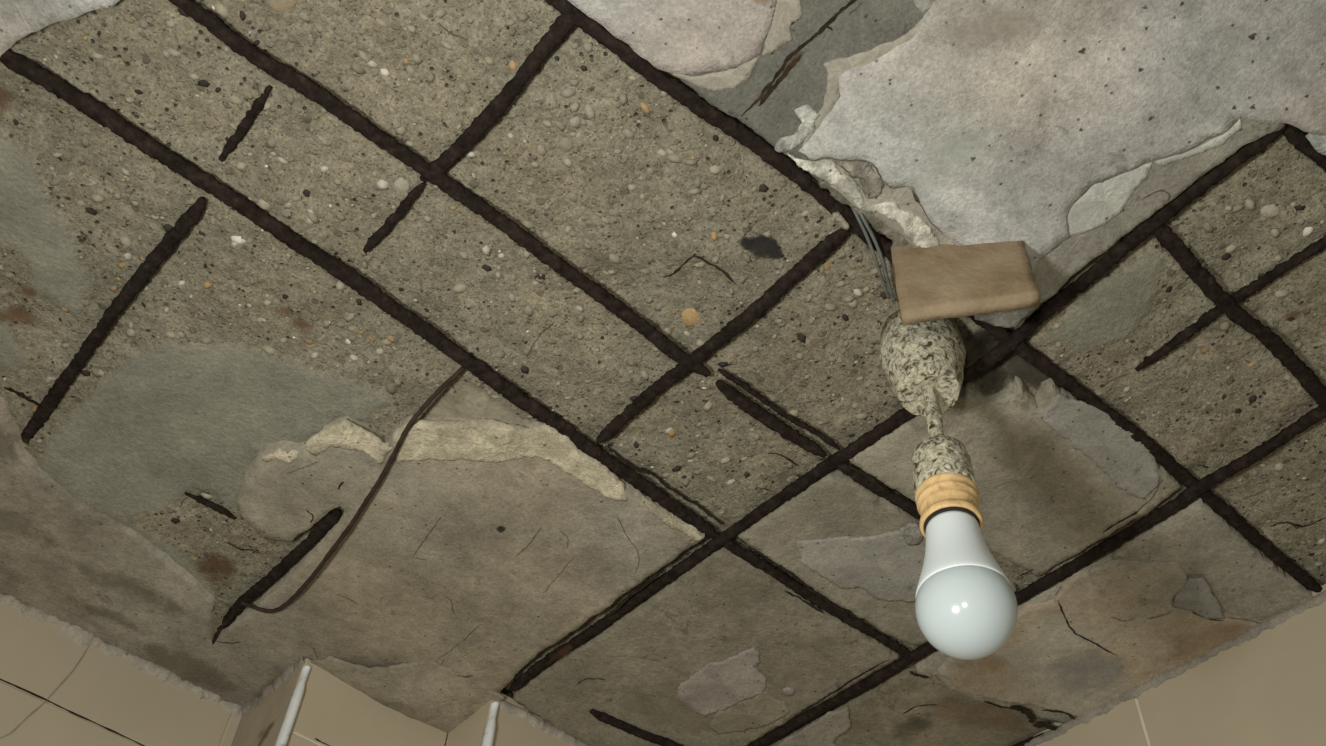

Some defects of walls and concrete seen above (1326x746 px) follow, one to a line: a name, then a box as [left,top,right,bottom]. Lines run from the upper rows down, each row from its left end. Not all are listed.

crack [741,0,862,117]
spalling [0,0,955,746]
spalling [941,234,1326,594]
spalling [1013,117,1326,388]
crack [0,645,144,746]
crack [212,606,239,645]
peeling [766,497,1313,746]